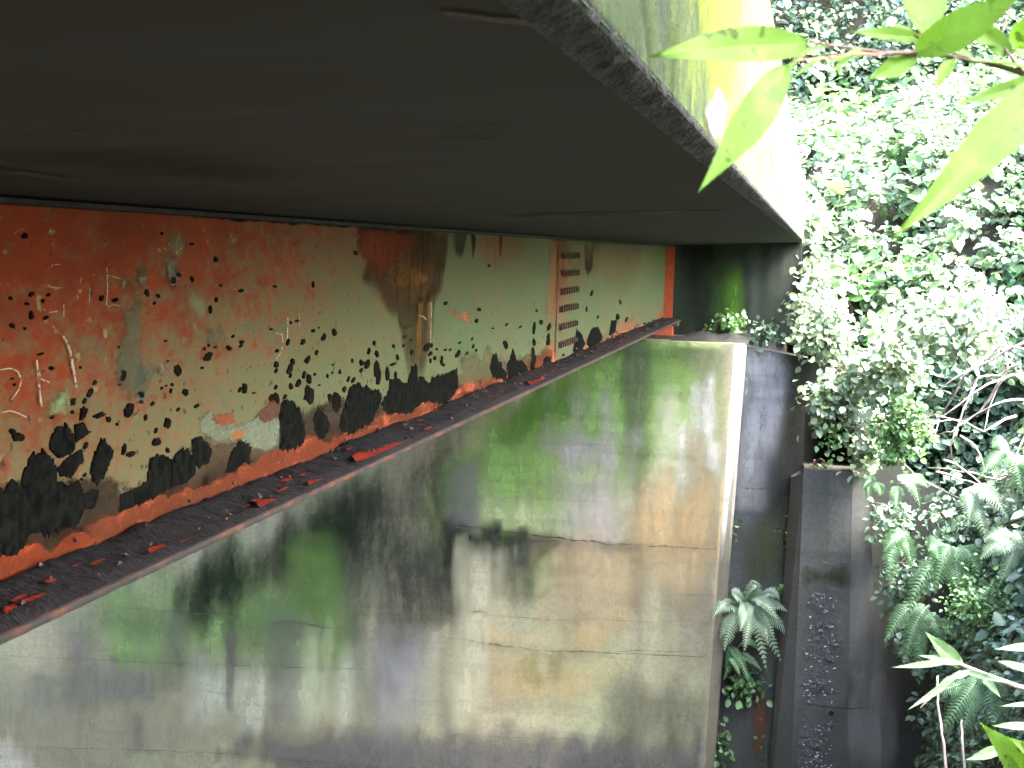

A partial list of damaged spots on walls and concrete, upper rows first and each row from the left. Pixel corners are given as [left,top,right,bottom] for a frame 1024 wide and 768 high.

peeling [0,376,512,580]
rust [0,217,553,556]
peeling [527,330,642,385]
water stain [624,343,649,556]
peeling [2,579,57,613]
water stain [0,637,705,768]
water stain [368,456,567,719]
spalling [797,592,843,768]